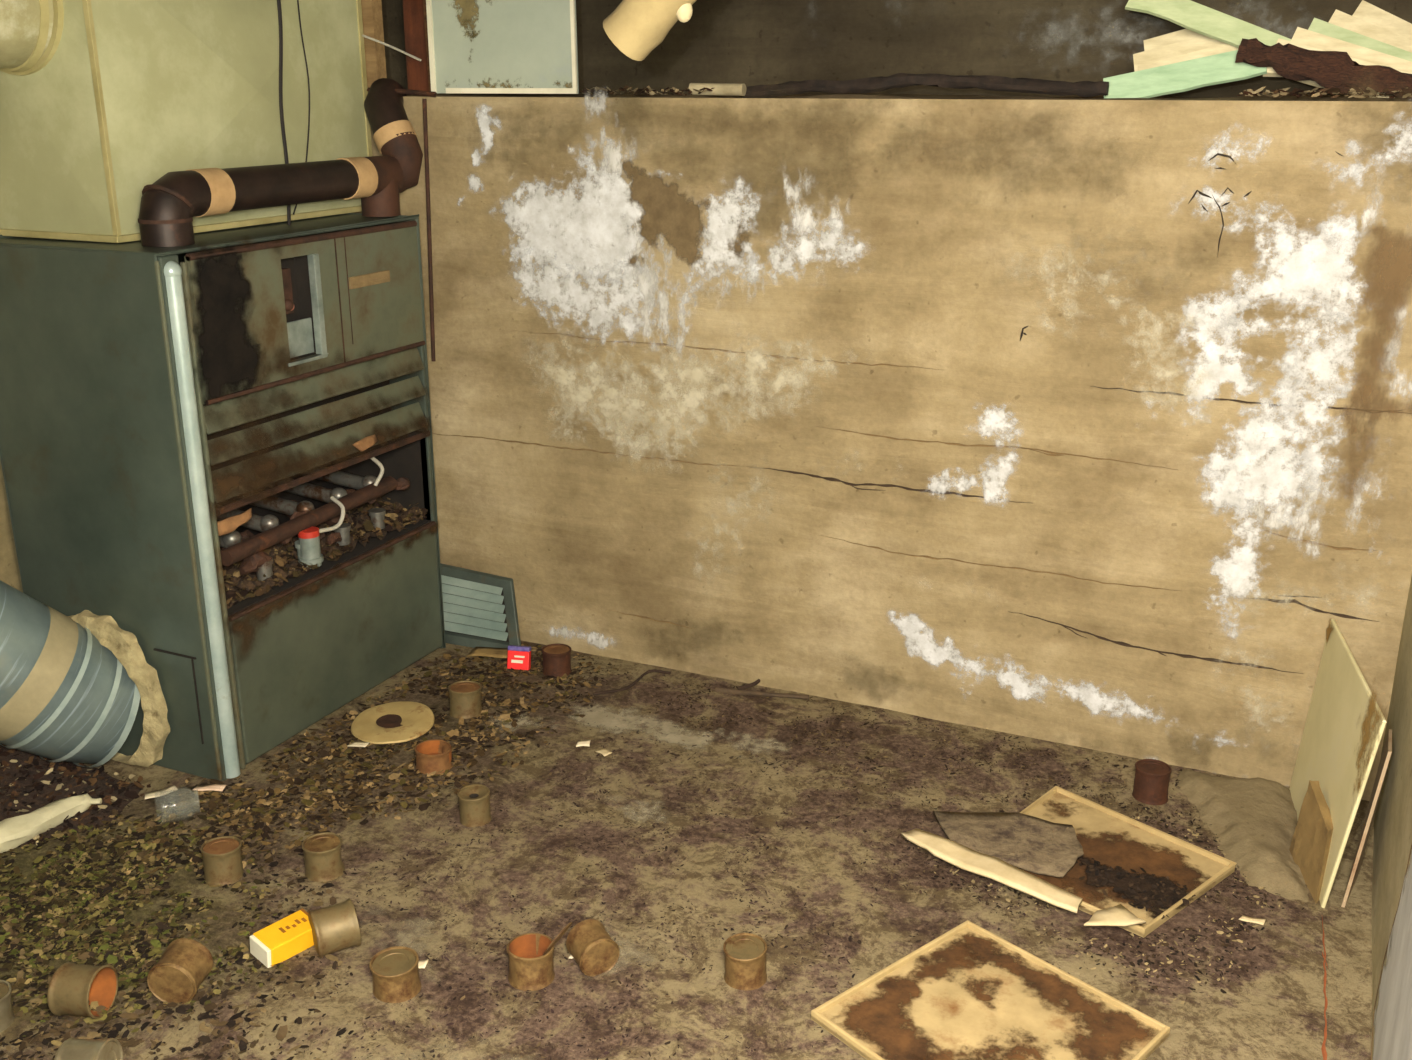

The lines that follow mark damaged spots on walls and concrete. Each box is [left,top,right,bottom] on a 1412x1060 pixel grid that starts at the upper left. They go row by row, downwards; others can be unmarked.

damp [1203,137,1269,169]
damp [1335,113,1412,180]
damp [490,94,864,457]
damp [1135,187,1412,638]
crack [433,433,1029,503]
damp [889,611,1160,721]
crack [1008,611,1303,674]
crack [1245,595,1379,622]